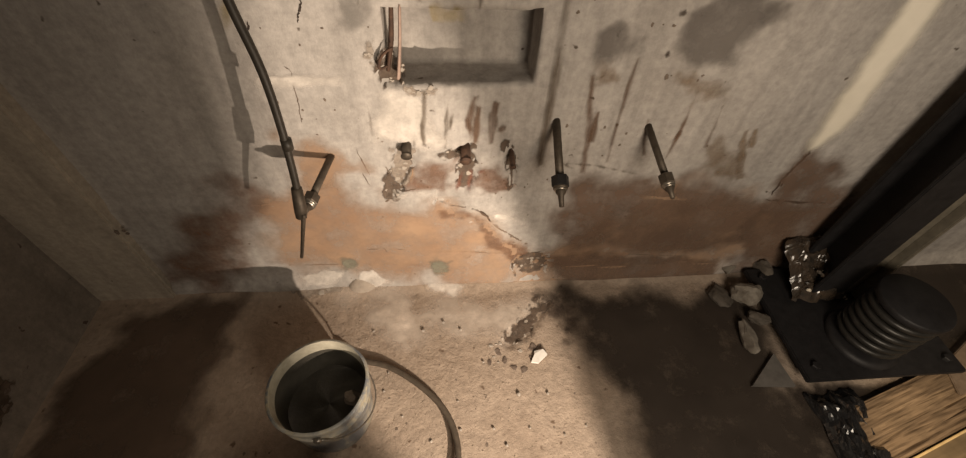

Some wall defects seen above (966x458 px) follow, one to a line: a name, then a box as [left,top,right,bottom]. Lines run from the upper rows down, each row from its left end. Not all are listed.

damp [596,24,626,59]
damp [681,0,778,64]
spalling [377,137,422,213]
spalling [428,143,482,187]
spalling [495,139,528,198]
corrosion [250,80,787,284]
damp [303,259,526,341]
spalling [488,298,553,373]